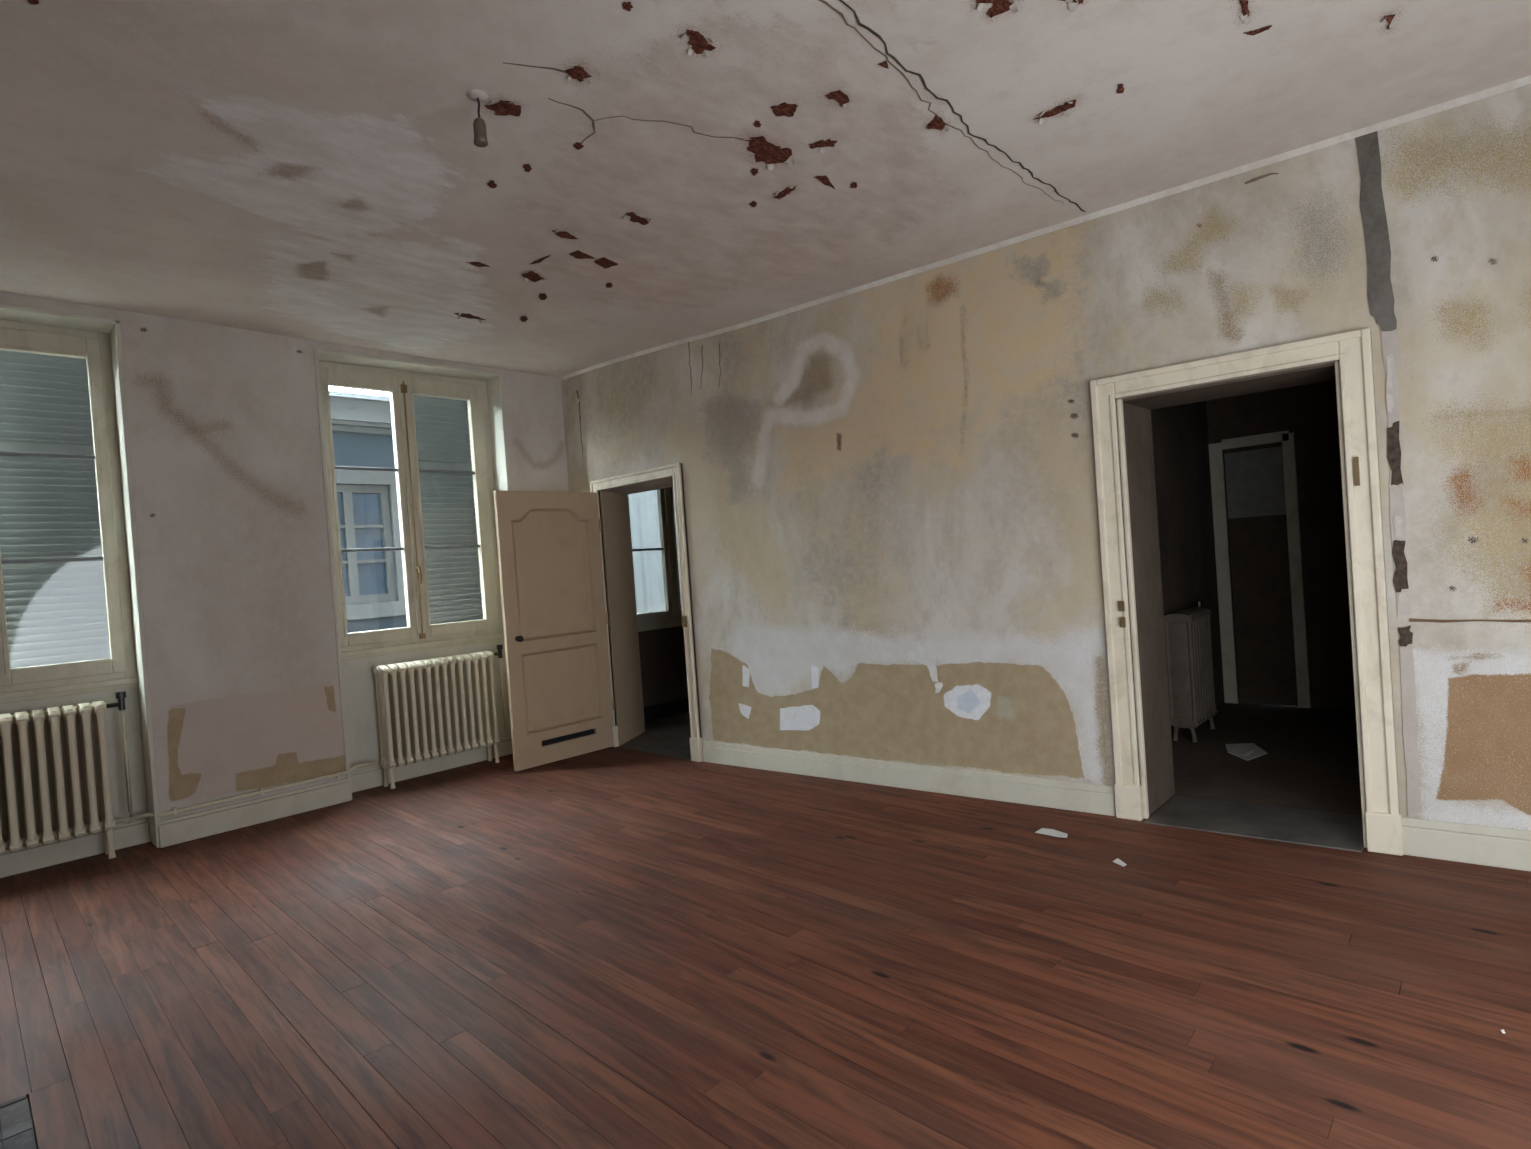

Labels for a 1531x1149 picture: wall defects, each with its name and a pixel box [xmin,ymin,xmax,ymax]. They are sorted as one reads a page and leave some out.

spalling [969,0,1085,25]
spalling [1226,0,1272,35]
spalling [672,18,726,62]
spalling [552,54,602,92]
spalling [475,93,531,119]
crack [505,63,744,144]
spalling [914,107,955,136]
crack [819,0,1086,212]
spalling [1025,92,1085,124]
spalling [730,84,858,207]
spalling [1355,131,1531,818]
peeling [709,646,1085,778]